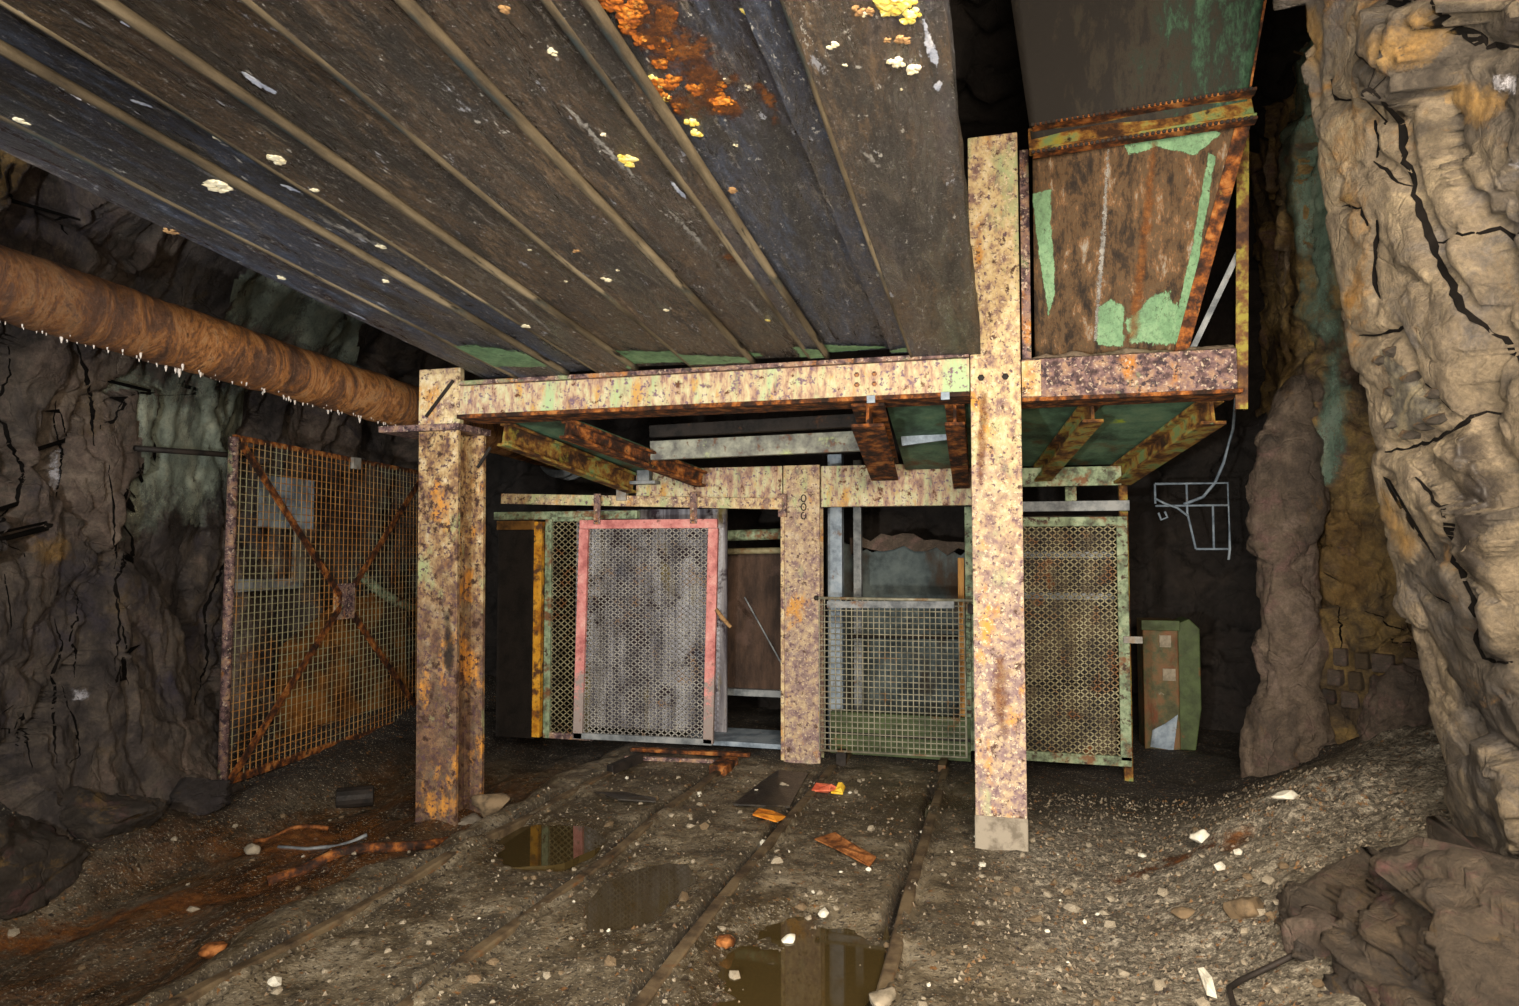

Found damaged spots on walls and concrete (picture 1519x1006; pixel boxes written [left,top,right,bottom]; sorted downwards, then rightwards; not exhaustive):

rust [598,0,779,124]
leakage [851,0,922,91]
peeling [1033,189,1055,315]
rust [1129,152,1154,337]
peeling [1096,131,1221,347]
rust [275,583,408,739]
rust [444,615,453,669]
rust [994,660,1006,723]